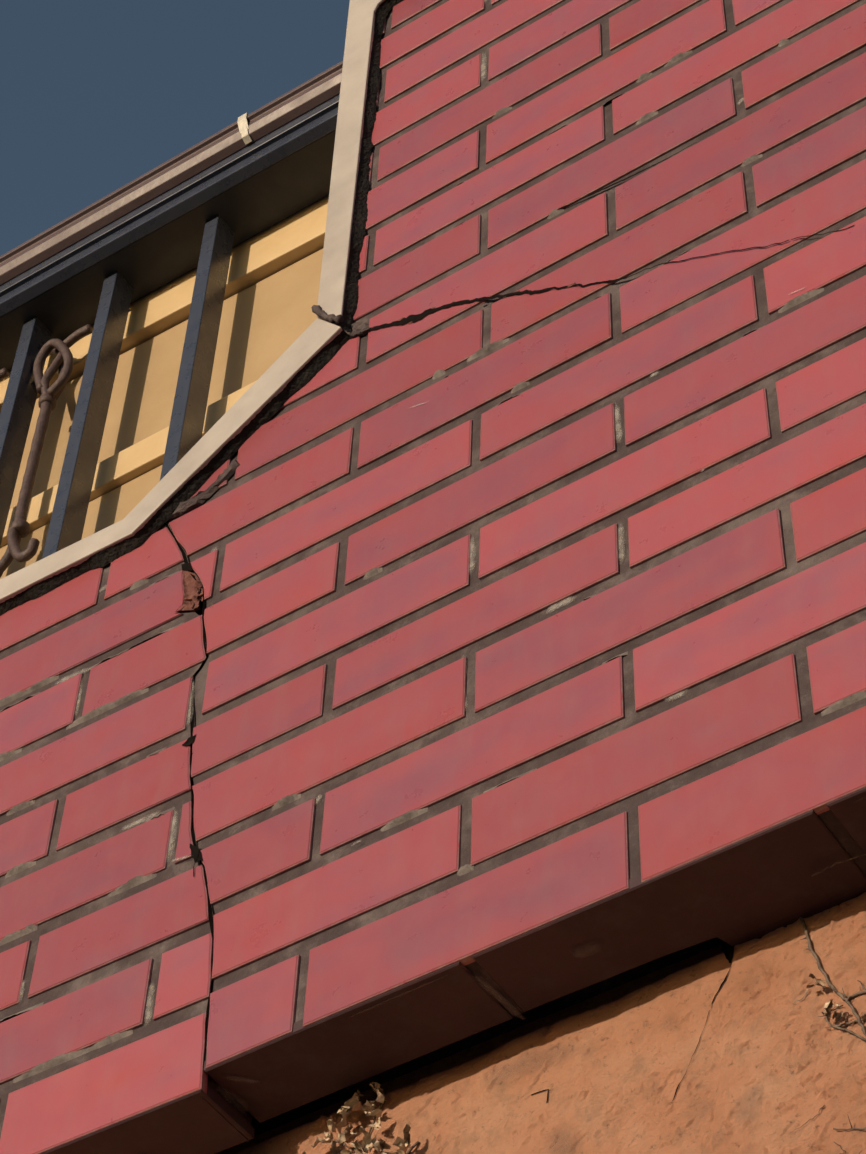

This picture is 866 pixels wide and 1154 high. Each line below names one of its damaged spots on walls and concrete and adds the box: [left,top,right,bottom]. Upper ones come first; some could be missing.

crack [350,225,854,338]
crack [164,521,214,1068]
crack [671,940,734,1103]